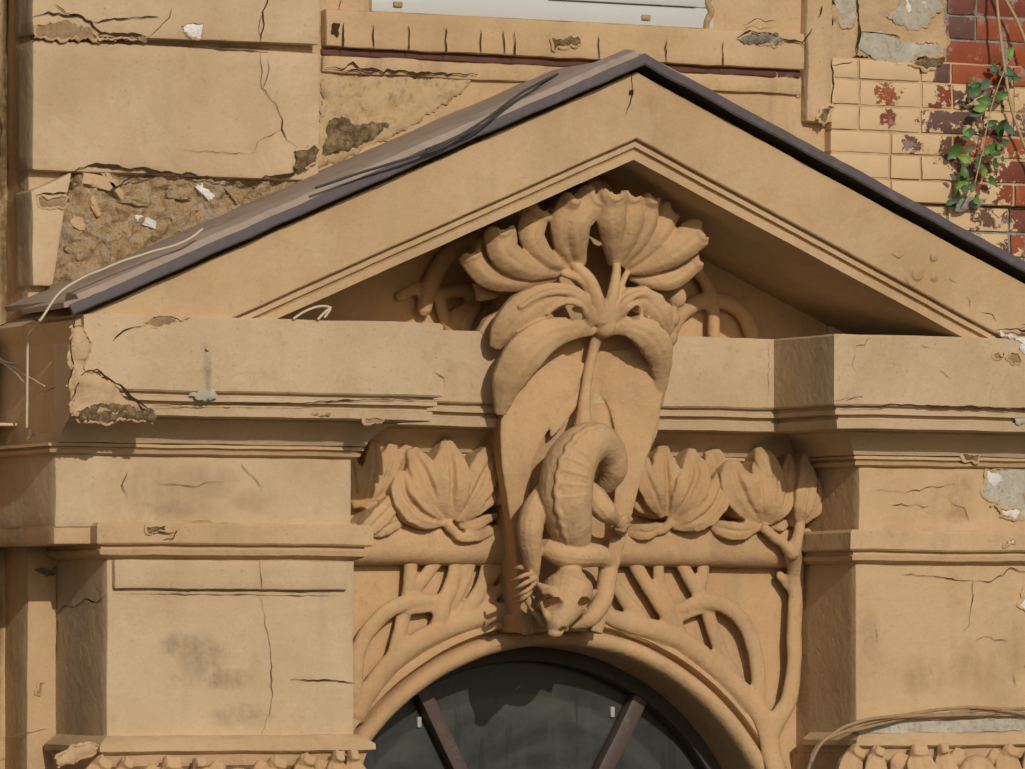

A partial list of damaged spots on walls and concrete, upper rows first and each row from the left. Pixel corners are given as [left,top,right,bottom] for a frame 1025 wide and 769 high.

spalling [33,20,147,43]
peeling [182,21,204,41]
peeling [835,0,951,73]
crack [191,0,296,154]
flaking render [73,61,478,193]
spalling [36,192,69,211]
spalling [66,323,157,426]
peeling [991,331,1025,366]
peeling [960,453,1025,522]
crack [901,567,1025,641]
crack [260,570,351,734]